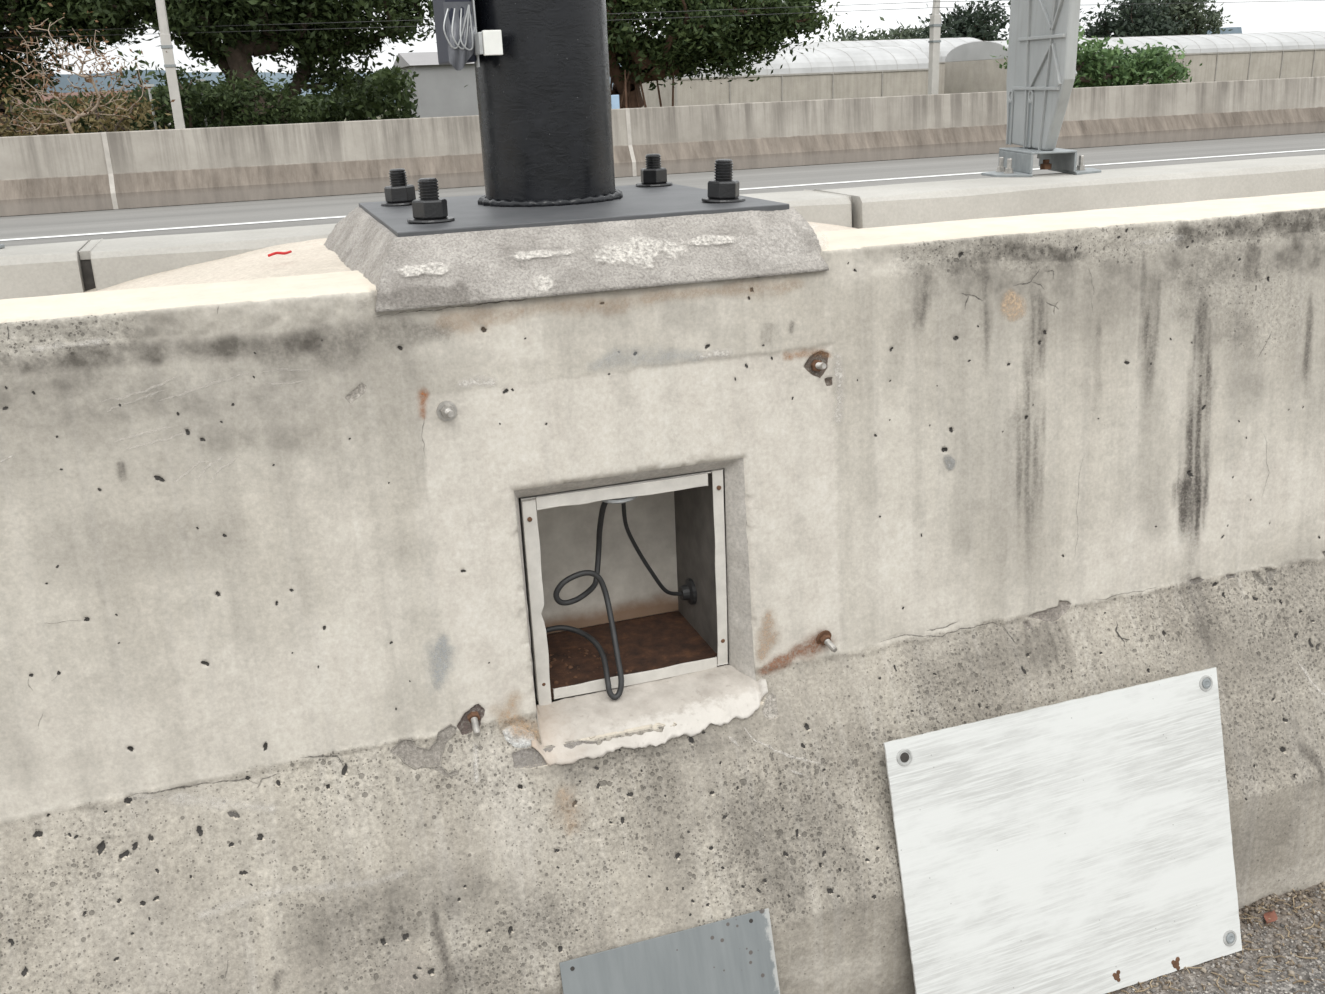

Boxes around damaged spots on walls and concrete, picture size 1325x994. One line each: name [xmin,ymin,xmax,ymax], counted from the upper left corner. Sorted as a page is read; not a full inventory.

water stain [1179,317,1211,528]
corrosion [759,614,823,673]